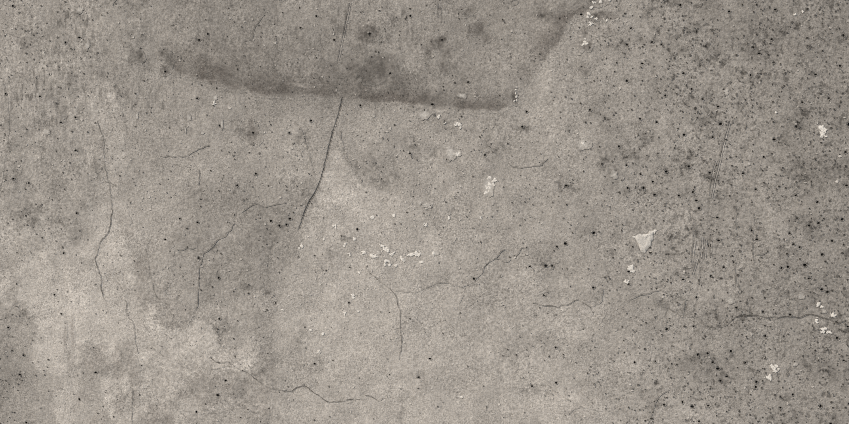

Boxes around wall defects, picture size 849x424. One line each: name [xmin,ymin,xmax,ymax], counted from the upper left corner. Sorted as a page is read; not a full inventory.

damp [156,0,591,116]
crack [94,121,116,299]
crack [125,300,138,353]
crack [177,202,286,310]
crack [206,356,384,403]
damp [0,71,629,424]
crack [294,98,352,230]
crack [365,247,528,359]
damp [612,346,649,385]
spalling [632,229,657,253]